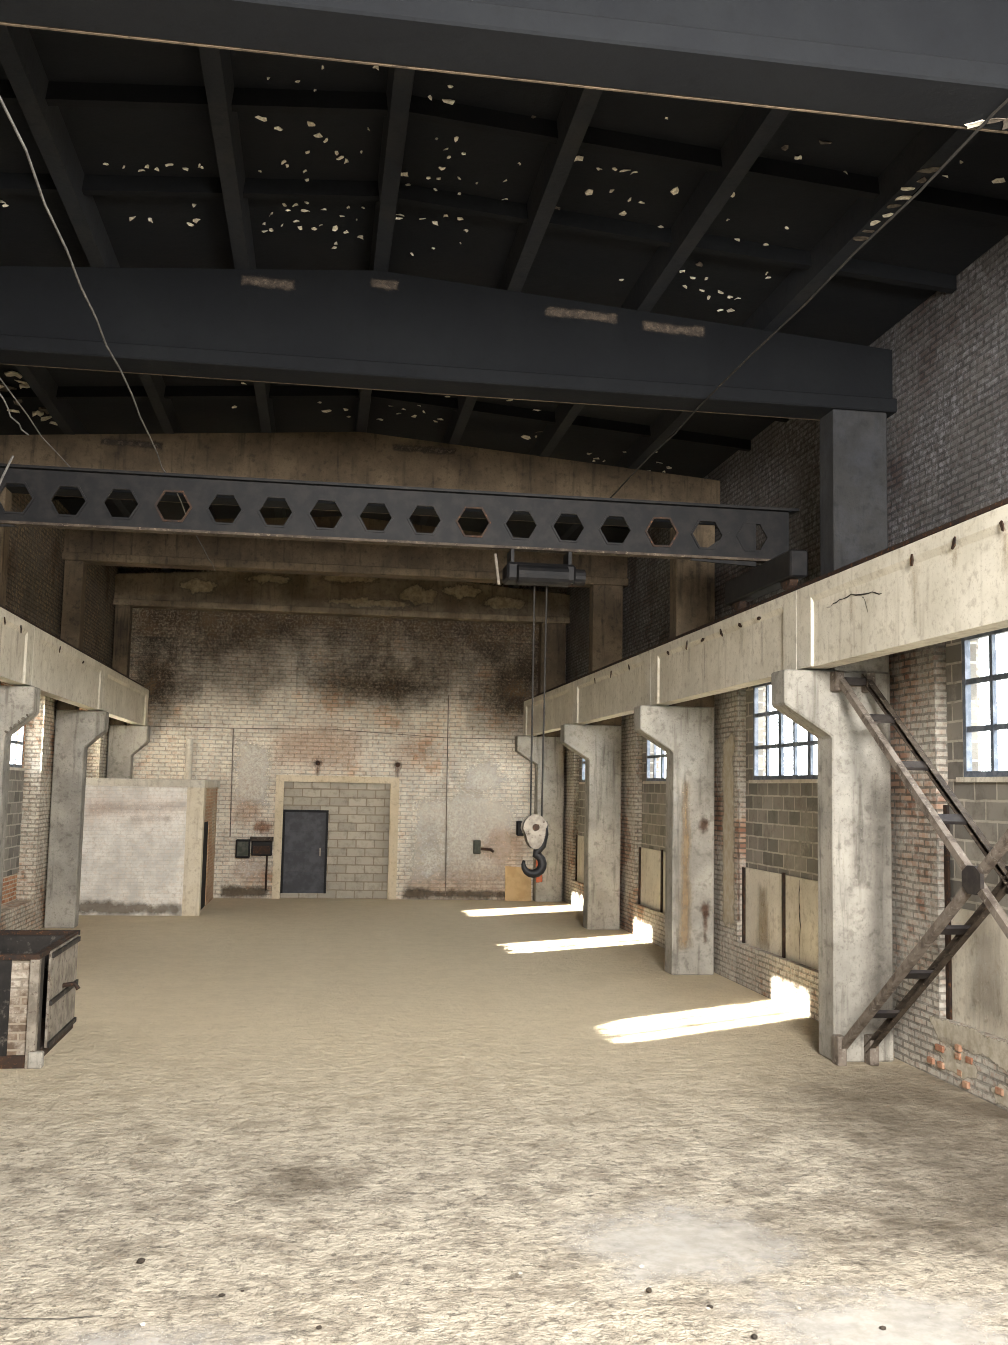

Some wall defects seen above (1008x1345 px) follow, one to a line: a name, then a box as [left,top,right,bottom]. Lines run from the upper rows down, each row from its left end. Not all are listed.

peeling [281,121,363,182]
peeling [426,136,478,195]
peeling [262,201,365,249]
peeling [323,576,526,610]
leakage [135,655,180,713]
leakage [319,669,436,702]